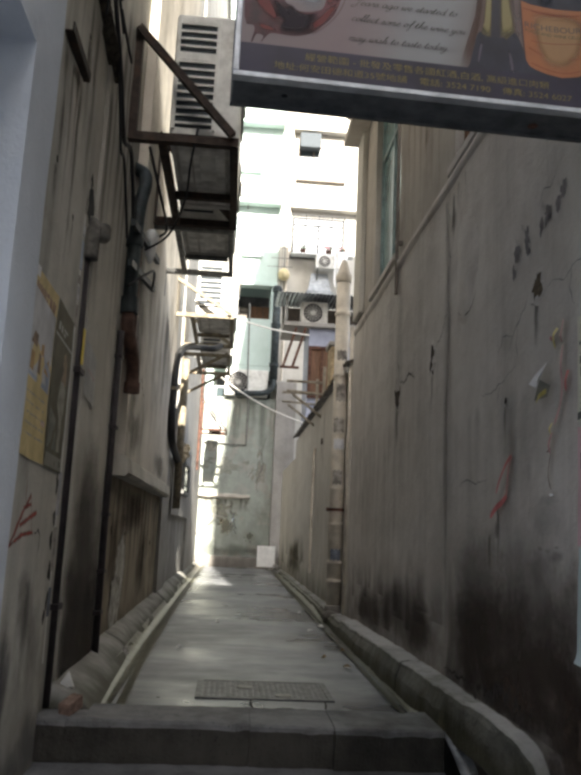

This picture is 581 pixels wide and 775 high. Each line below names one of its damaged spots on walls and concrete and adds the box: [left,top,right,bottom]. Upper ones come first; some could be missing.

peeling [539,178,567,238]
peeling [512,224,530,282]
flaking render [529,267,546,308]
crack [436,237,482,521]
peeling [206,499,237,519]
damp [457,604,581,775]